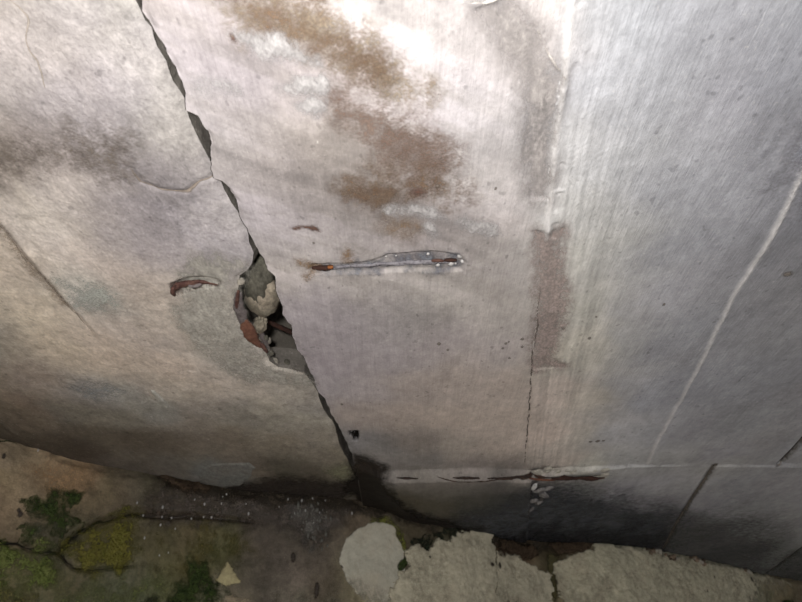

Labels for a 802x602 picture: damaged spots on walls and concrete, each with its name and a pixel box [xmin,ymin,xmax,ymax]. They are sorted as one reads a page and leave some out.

crack [130,0,356,469]
spalling [170,253,314,386]
rust [437,472,610,483]
spalling [529,466,577,513]
crack [662,463,718,549]
crack [777,437,802,466]
crack [0,514,145,571]